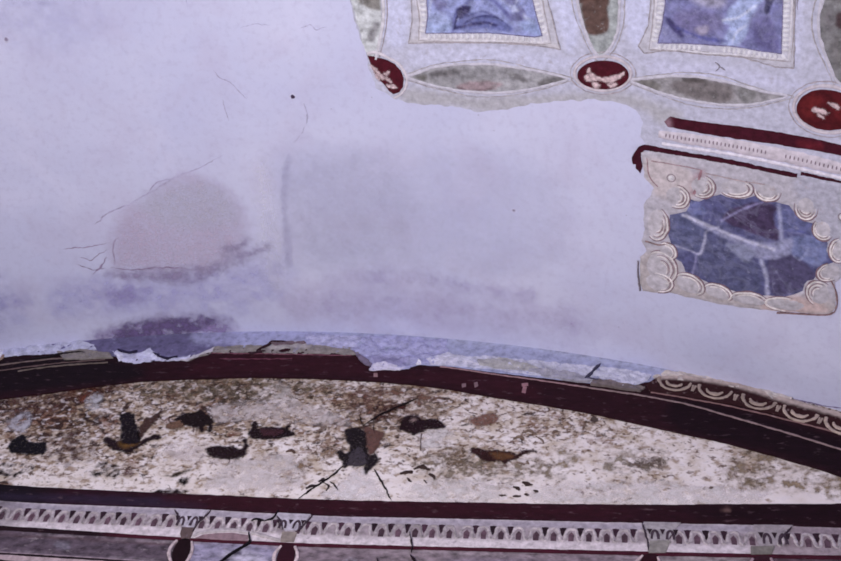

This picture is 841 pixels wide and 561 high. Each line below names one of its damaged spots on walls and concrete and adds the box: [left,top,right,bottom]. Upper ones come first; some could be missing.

water stain [66,237,188,280]
water stain [100,316,228,339]
spalling [0,331,792,399]
crack [359,398,418,433]
crack [298,466,343,499]
crack [374,469,391,499]
crack [220,509,279,561]